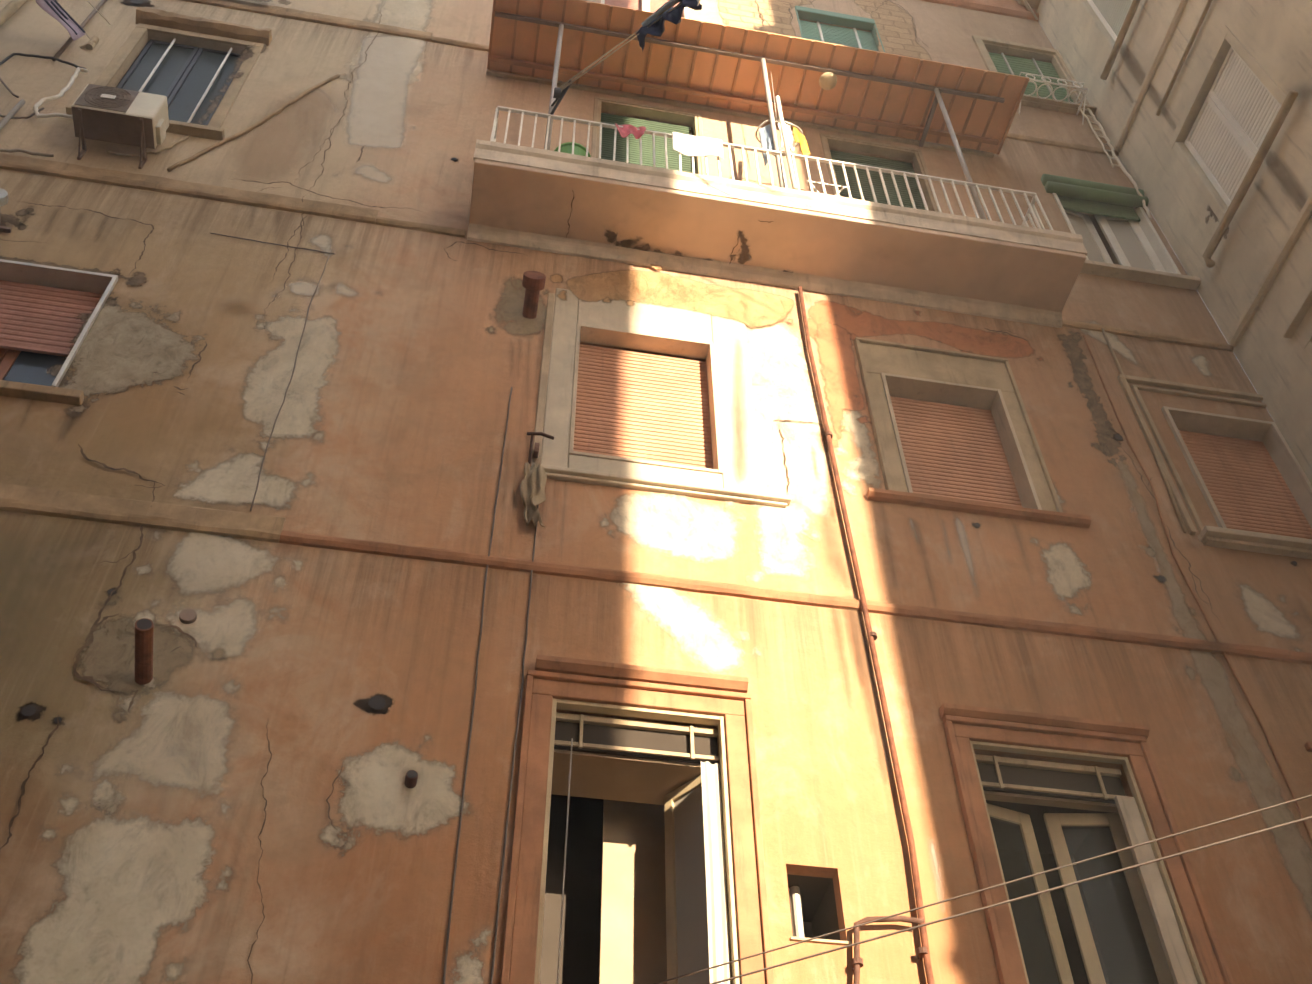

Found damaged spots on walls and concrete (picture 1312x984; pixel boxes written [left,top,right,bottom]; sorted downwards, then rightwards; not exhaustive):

peeling [340,0,432,148]
spalling [718,0,811,37]
spalling [854,0,932,60]
crack [227,4,422,320]
peeling [173,282,341,509]
peeling [544,230,1043,582]
crack [73,444,169,711]
peeling [134,532,302,658]
peeling [623,583,746,673]
crack [0,715,59,849]
peeling [14,679,240,984]
peeling [320,741,469,850]